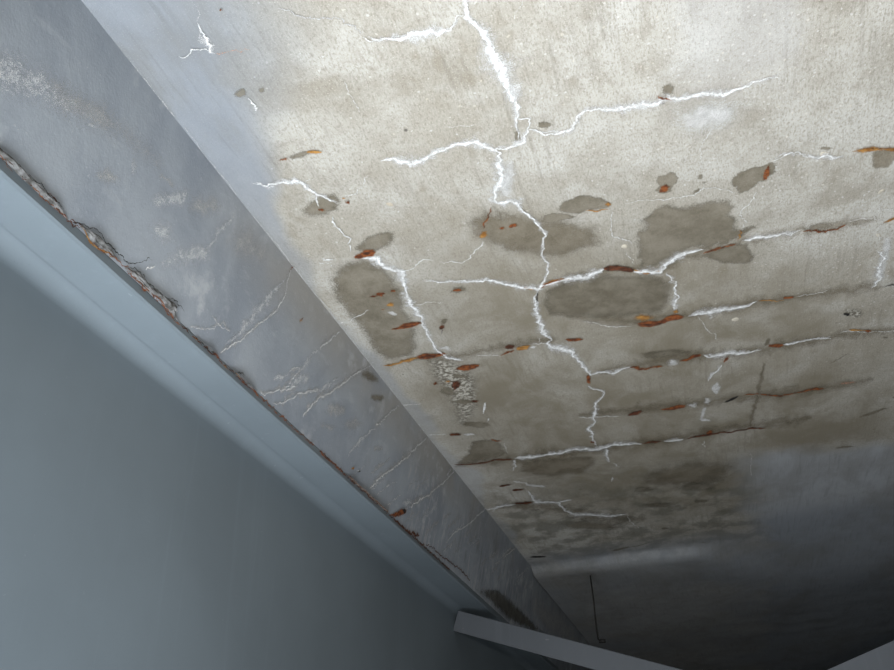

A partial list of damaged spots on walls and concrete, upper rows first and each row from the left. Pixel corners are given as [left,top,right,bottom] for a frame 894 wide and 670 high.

leakage [656,172,678,194]
leakage [731,163,777,193]
rust [855,146,894,169]
leakage [327,232,421,361]
crack [130,0,894,543]
leakage [460,195,611,259]
leakage [541,199,756,318]
spalling [0,148,470,581]
spalling [425,359,490,428]
rust [383,335,554,371]
leakage [700,357,728,421]
leakage [522,455,595,477]